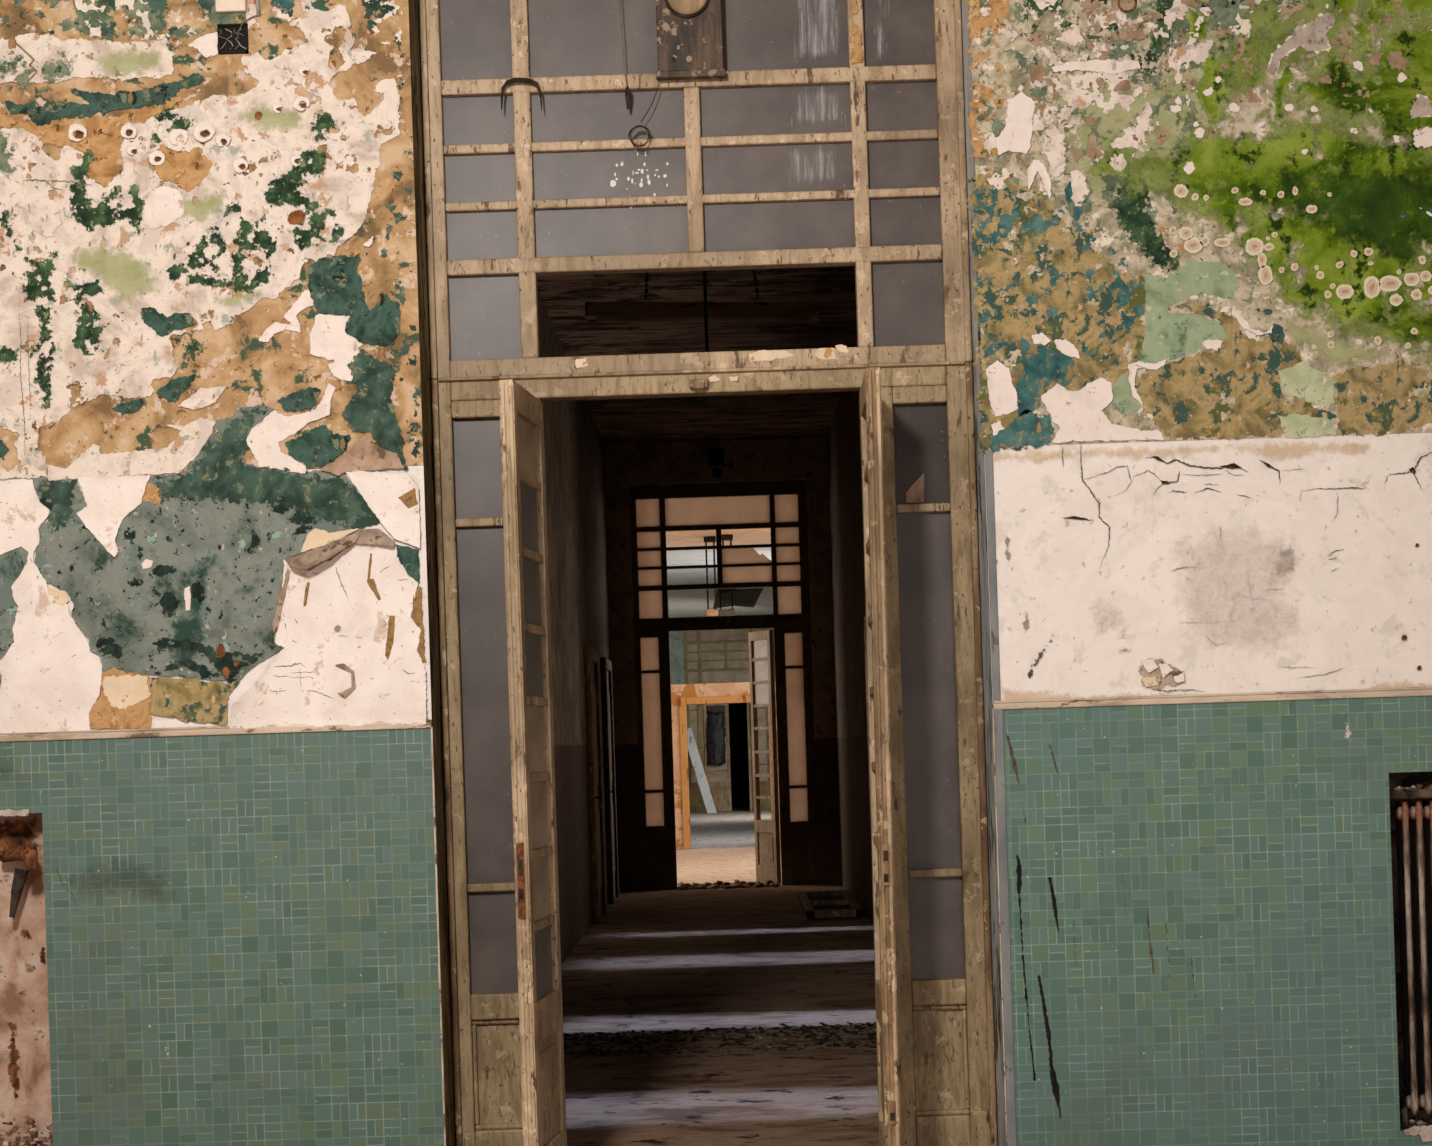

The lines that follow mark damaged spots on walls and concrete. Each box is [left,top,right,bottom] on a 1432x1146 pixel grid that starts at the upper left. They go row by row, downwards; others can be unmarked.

flaking render [965,0,1432,454]
peeling [0,0,427,736]
crack [1062,444,1432,572]
corrosion [0,817,40,854]
corrosion [21,929,46,964]
corrosion [8,1022,20,1098]